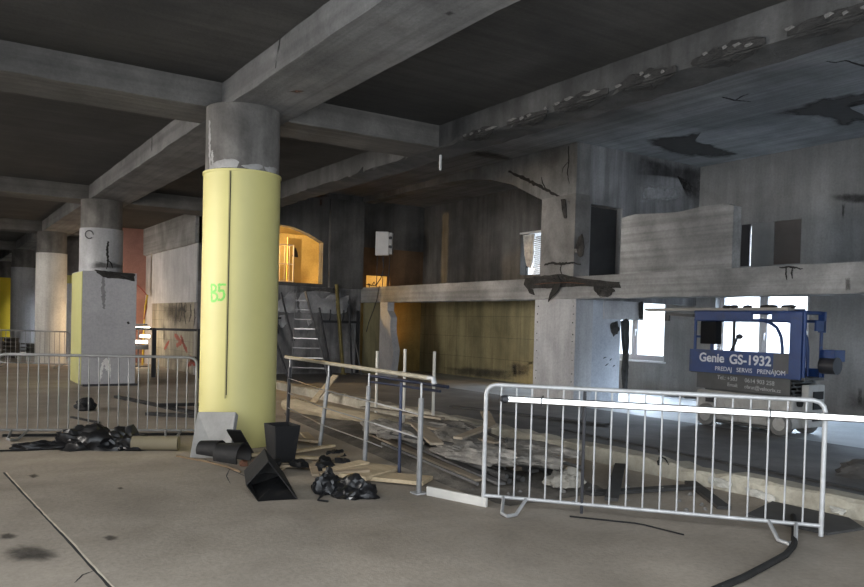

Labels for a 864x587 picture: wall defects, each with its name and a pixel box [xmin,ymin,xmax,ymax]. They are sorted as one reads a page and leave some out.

peeling [786,94,864,125]
peeling [651,133,736,157]
peeling [209,159,277,174]
crack [508,146,570,197]
crack [105,241,113,269]